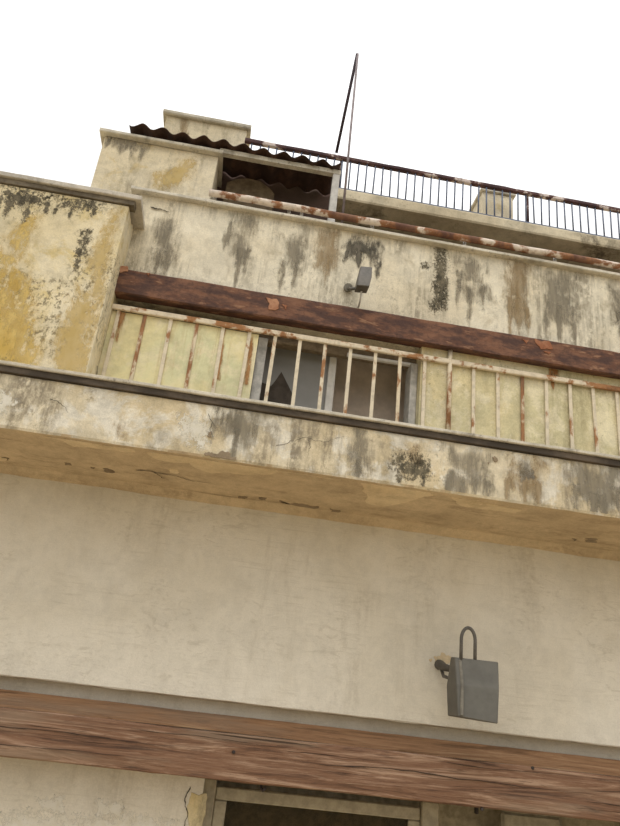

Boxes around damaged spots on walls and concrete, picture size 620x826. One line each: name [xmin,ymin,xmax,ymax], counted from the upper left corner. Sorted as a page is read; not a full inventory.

water stain [0,185,106,366]
water stain [54,210,123,372]
water stain [316,231,384,277]
water stain [421,247,491,319]
water stain [504,262,577,339]
water stain [609,286,620,334]
water stain [349,428,365,477]
mould [388,452,433,486]
water stain [445,449,489,496]
water stain [505,458,547,504]
water stain [572,463,619,514]